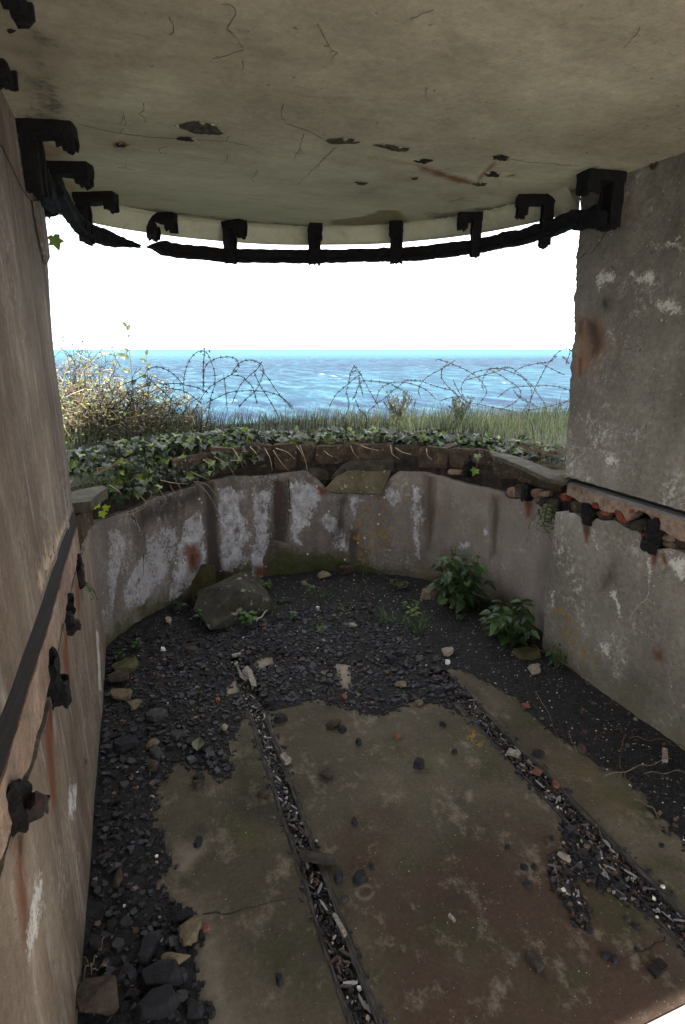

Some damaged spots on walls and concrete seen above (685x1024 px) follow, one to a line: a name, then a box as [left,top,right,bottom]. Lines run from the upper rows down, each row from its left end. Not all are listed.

crack [212,4,244,68]
spalling [176,121,224,142]
spalling [374,143,433,164]
rust [361,153,502,188]
leakage [592,232,685,320]
rust [571,302,620,387]
rust [182,541,204,585]
crack [203,898,289,915]